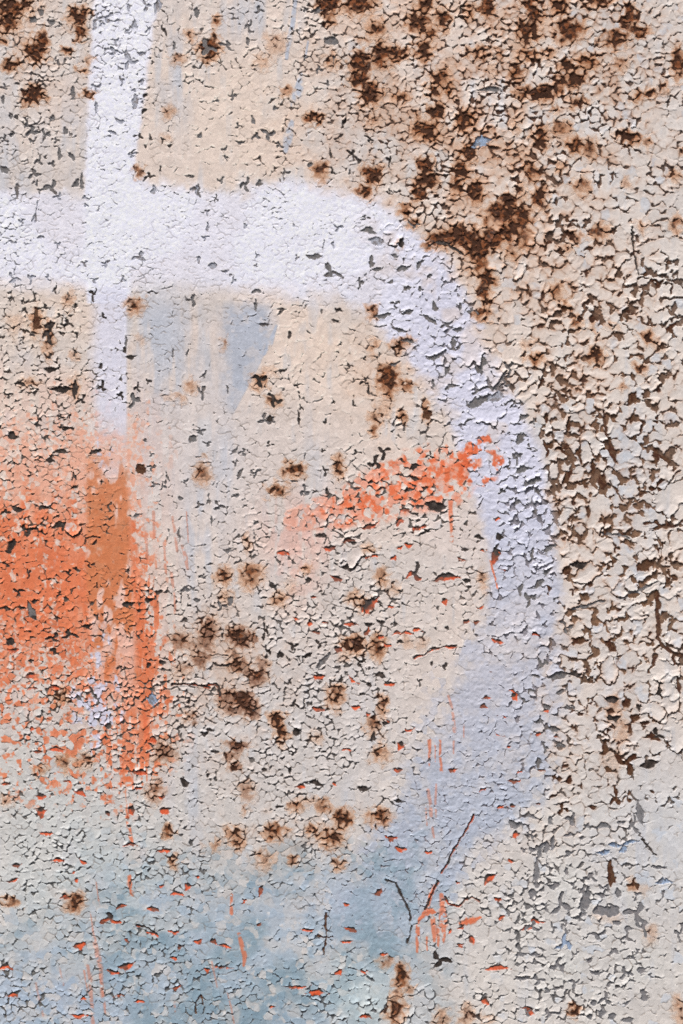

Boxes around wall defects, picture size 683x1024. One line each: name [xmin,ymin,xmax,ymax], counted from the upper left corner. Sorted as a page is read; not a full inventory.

corrosion [0,0,101,117]
crack [179,0,554,324]
corrosion [308,0,657,325]
crack [0,285,115,549]
crack [0,447,459,1024]
corrosion [140,530,326,810]
corrosion [198,735,398,878]
crack [330,0,683,1024]
peeling [486,634,683,1023]
peeling [518,445,683,617]
peeling [624,392,665,431]
peeling [642,629,683,648]